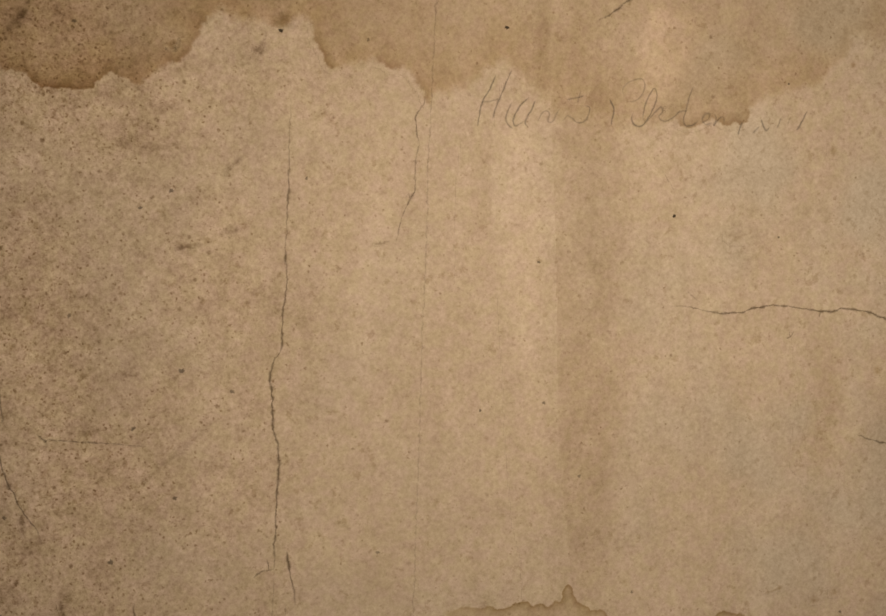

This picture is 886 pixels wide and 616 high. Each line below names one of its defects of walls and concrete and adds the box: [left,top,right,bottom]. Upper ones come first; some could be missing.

water stain [0,0,554,109]
water stain [435,0,886,616]